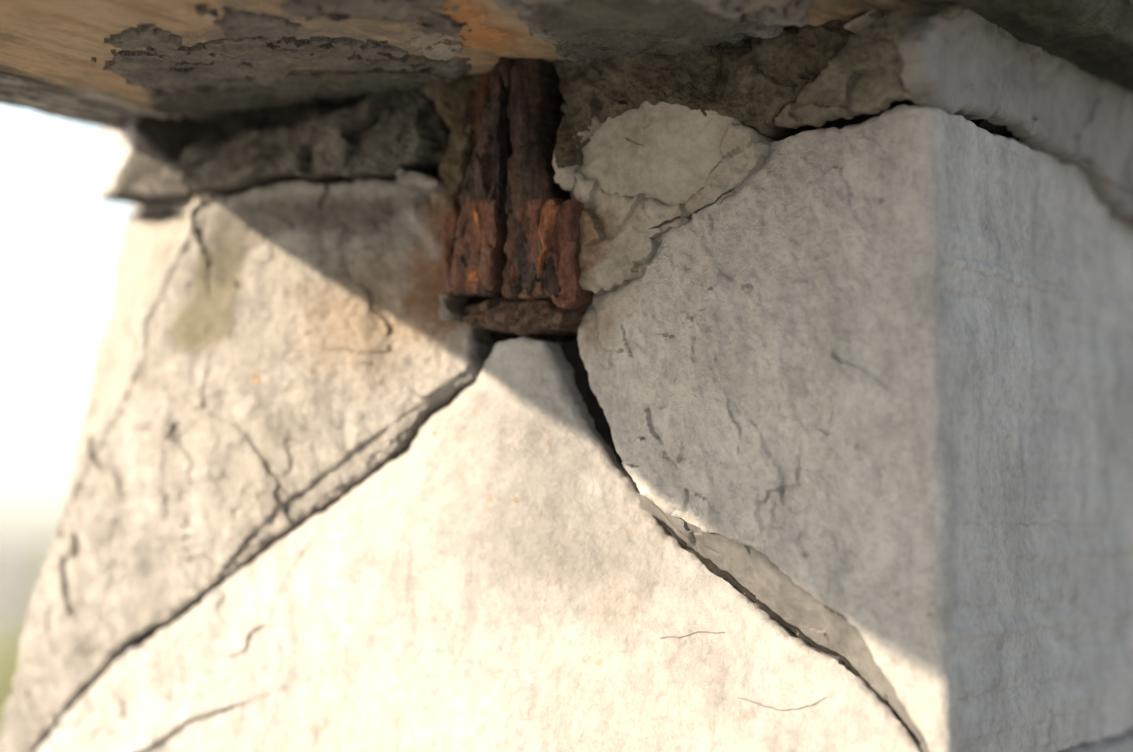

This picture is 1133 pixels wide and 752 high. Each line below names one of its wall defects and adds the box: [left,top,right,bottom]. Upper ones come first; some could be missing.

peeling [280,0,472,61]
rust [441,0,515,52]
peeling [844,10,881,33]
crack [791,98,919,136]
crack [124,189,203,219]
rust [439,196,602,312]
crack [488,330,625,469]
crack [274,409,439,530]
crack [651,504,922,752]
crack [138,711,219,752]